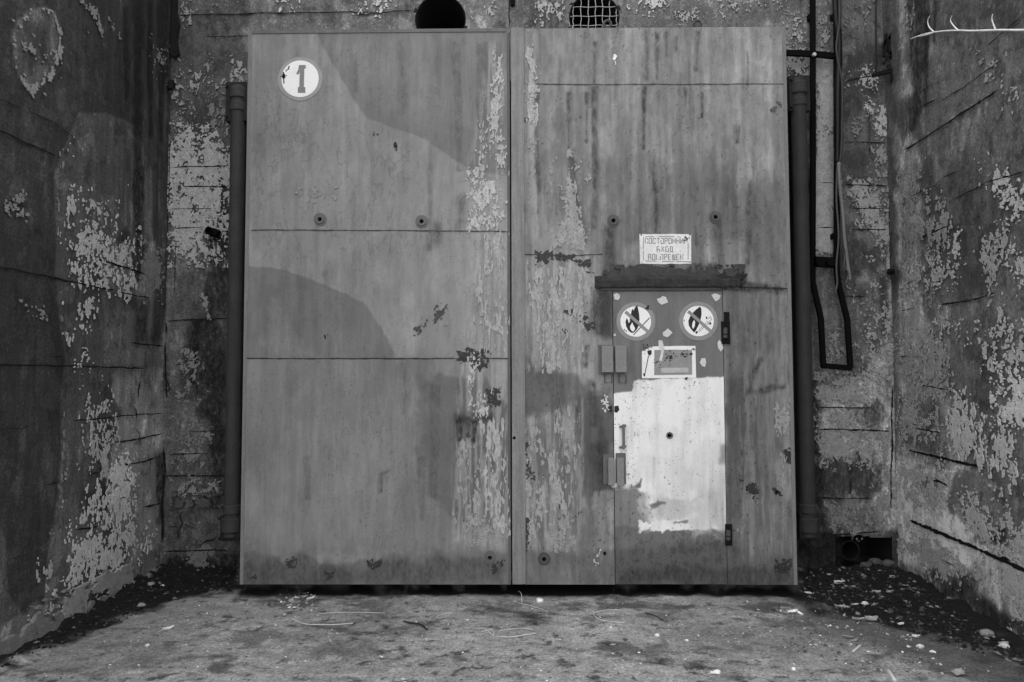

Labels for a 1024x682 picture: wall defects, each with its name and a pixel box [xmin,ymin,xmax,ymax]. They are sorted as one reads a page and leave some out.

peeling [0,33,248,655]
peeling [627,0,1024,631]